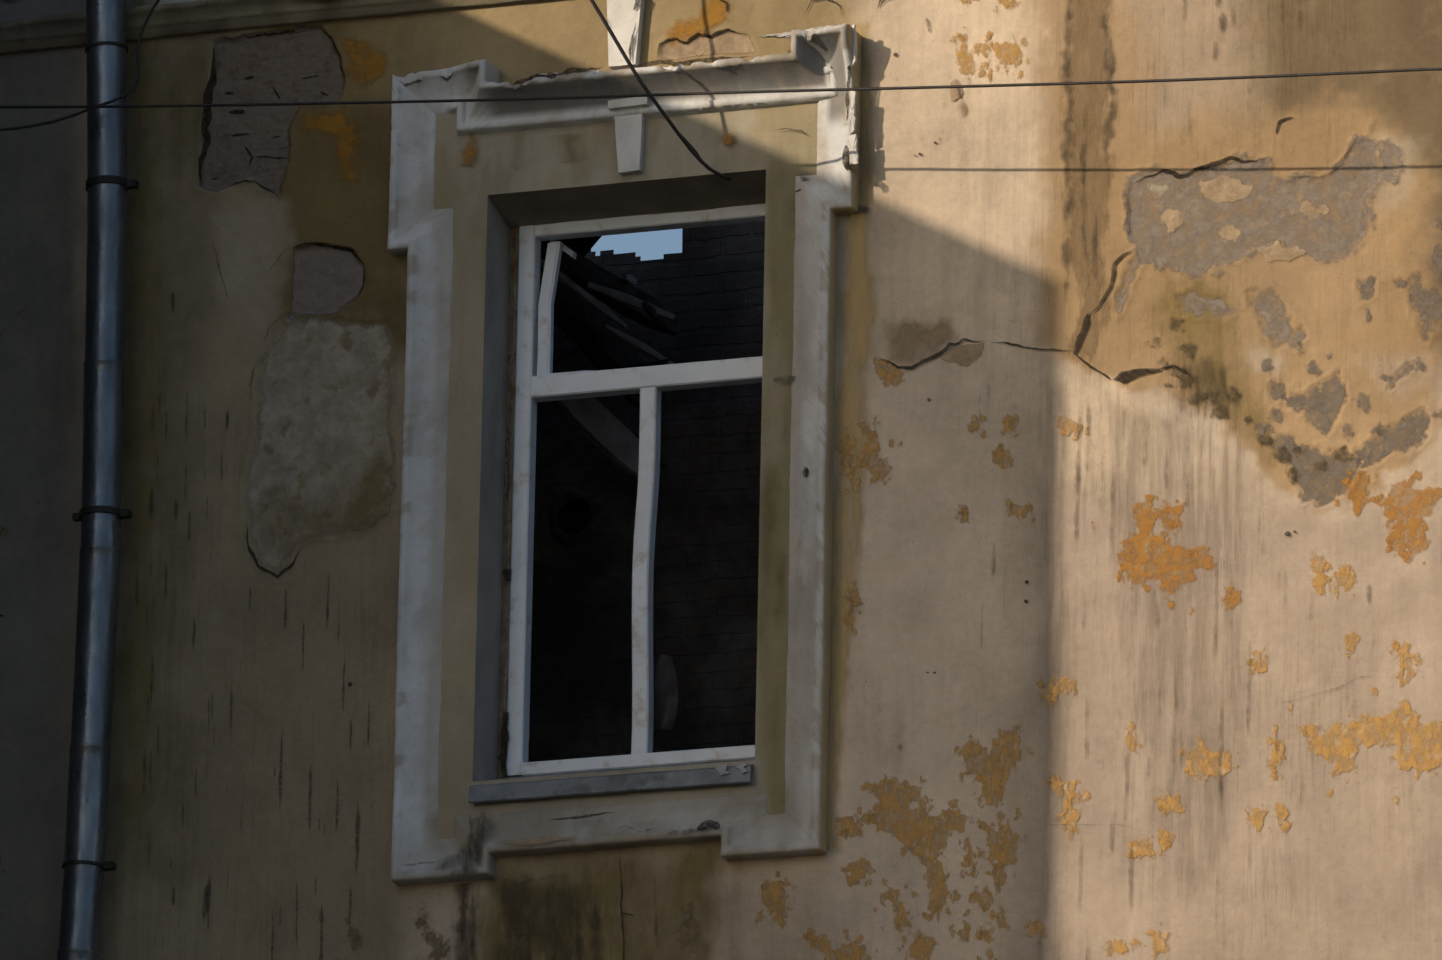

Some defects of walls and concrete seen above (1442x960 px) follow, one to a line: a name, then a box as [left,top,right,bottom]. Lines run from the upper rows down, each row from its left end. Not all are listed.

flaking render [198,24,345,197]
peeling [620,24,862,177]
peeling [949,31,1027,114]
crack [880,198,1191,384]
damp [1062,0,1115,360]
peeling [1115,135,1405,321]
peeling [246,242,395,578]
peeling [1254,292,1442,564]
peeling [1116,494,1216,609]
peeling [1298,641,1442,796]
damp [407,813,657,960]
peeling [835,723,1045,960]